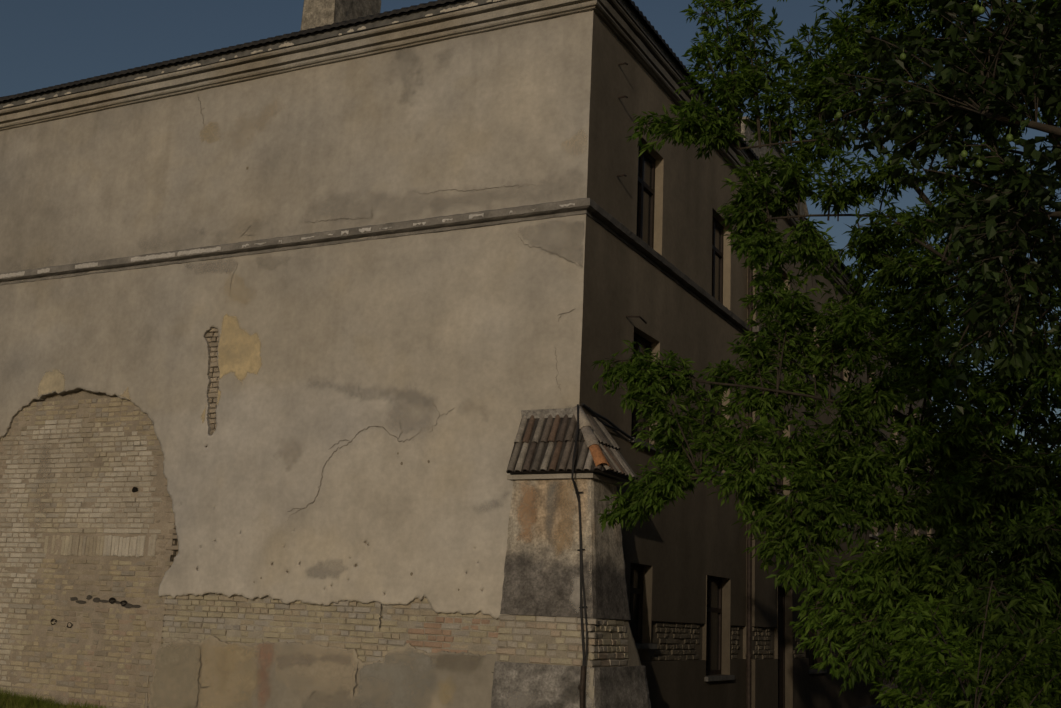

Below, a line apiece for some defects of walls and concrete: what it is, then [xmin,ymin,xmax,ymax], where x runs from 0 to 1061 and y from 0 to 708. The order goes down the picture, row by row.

peeling [206,315,261,435]
crack [287,405,455,519]
flaking render [0,370,628,708]